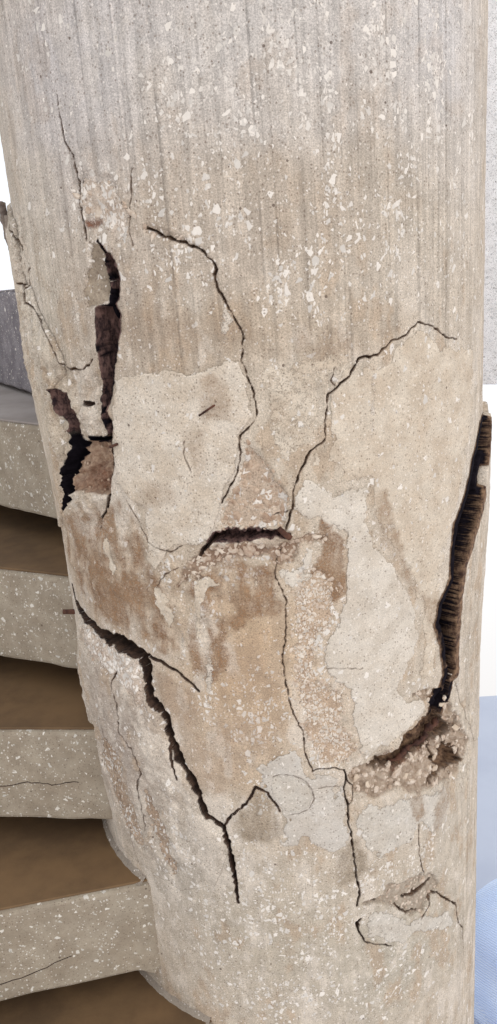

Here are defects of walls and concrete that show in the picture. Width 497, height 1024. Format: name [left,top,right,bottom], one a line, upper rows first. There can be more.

crack [58,102,87,238]
crack [9,230,93,370]
spalling [83,244,111,307]
crack [129,171,258,503]
peeling [71,330,473,875]
crack [274,321,462,946]
peeling [364,873,453,944]